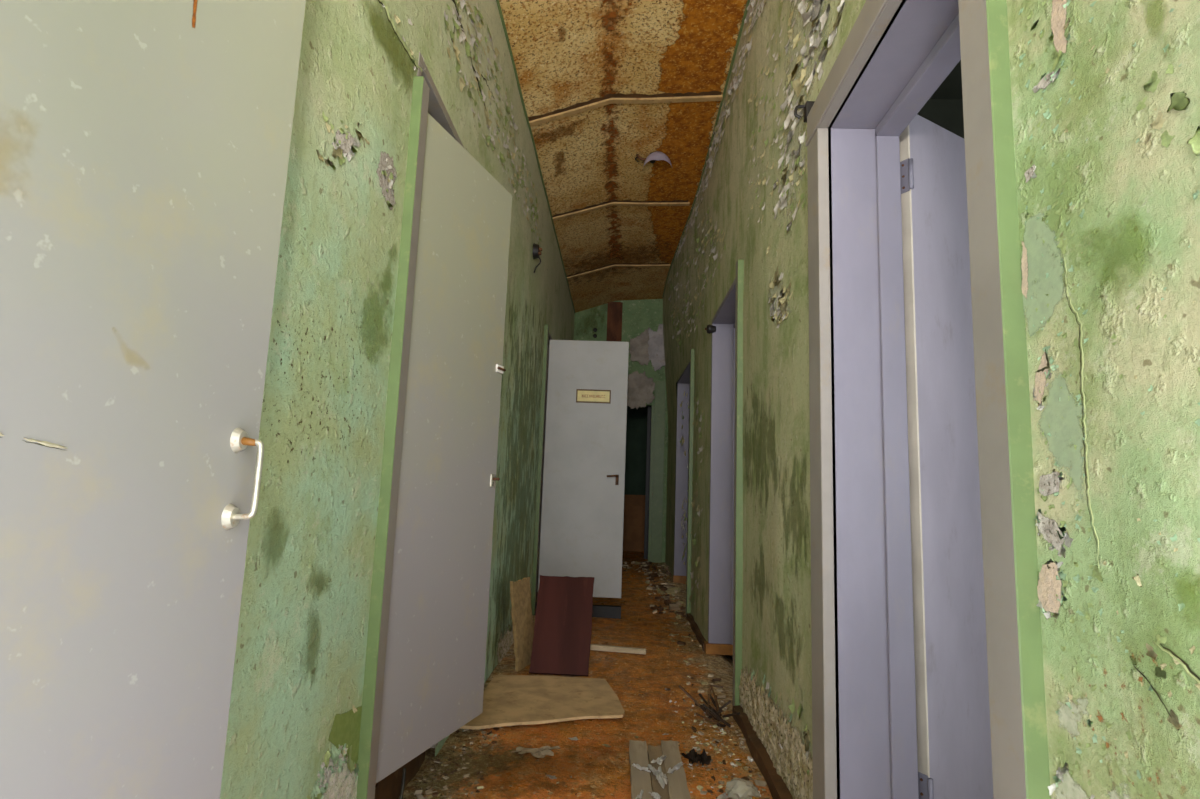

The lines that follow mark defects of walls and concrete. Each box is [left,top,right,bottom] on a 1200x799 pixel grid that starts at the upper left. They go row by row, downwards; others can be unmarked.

peeling [316,111,397,210]
rust [565,0,747,281]
peeling [773,0,845,233]
peeling [768,267,793,328]
peeling [627,324,665,410]
spalling [1034,469,1074,619]
crack [1130,634,1200,723]
spalling [307,706,362,799]